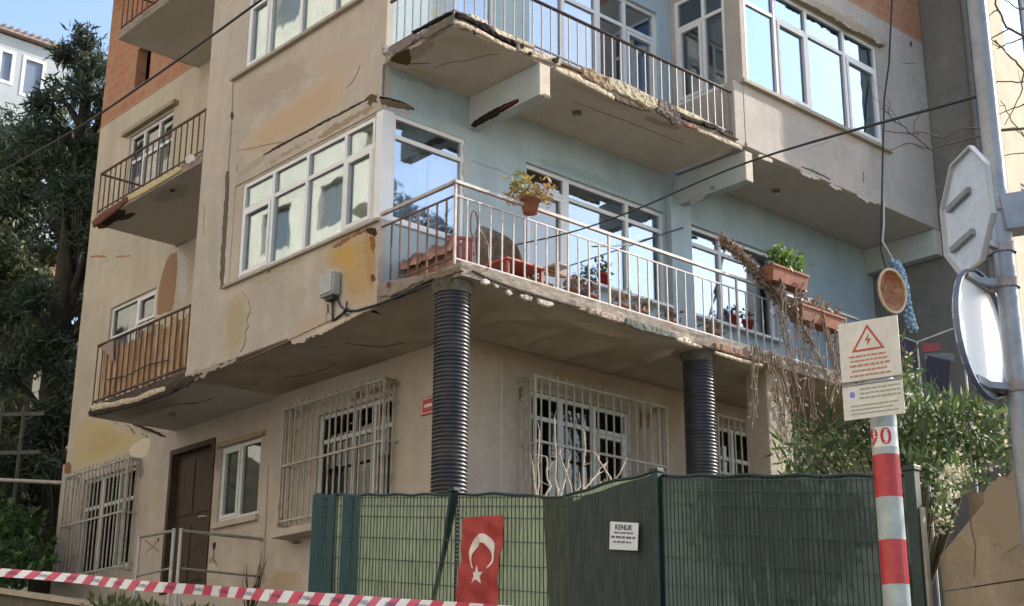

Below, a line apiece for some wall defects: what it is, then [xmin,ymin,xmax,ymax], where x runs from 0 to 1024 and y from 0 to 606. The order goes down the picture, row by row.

spalling [382,12,743,150]
spalling [366,94,414,115]
spalling [91,154,196,228]
peeling [799,171,842,191]
damp [323,227,380,309]
spalling [480,278,554,308]
spalling [88,380,185,416]